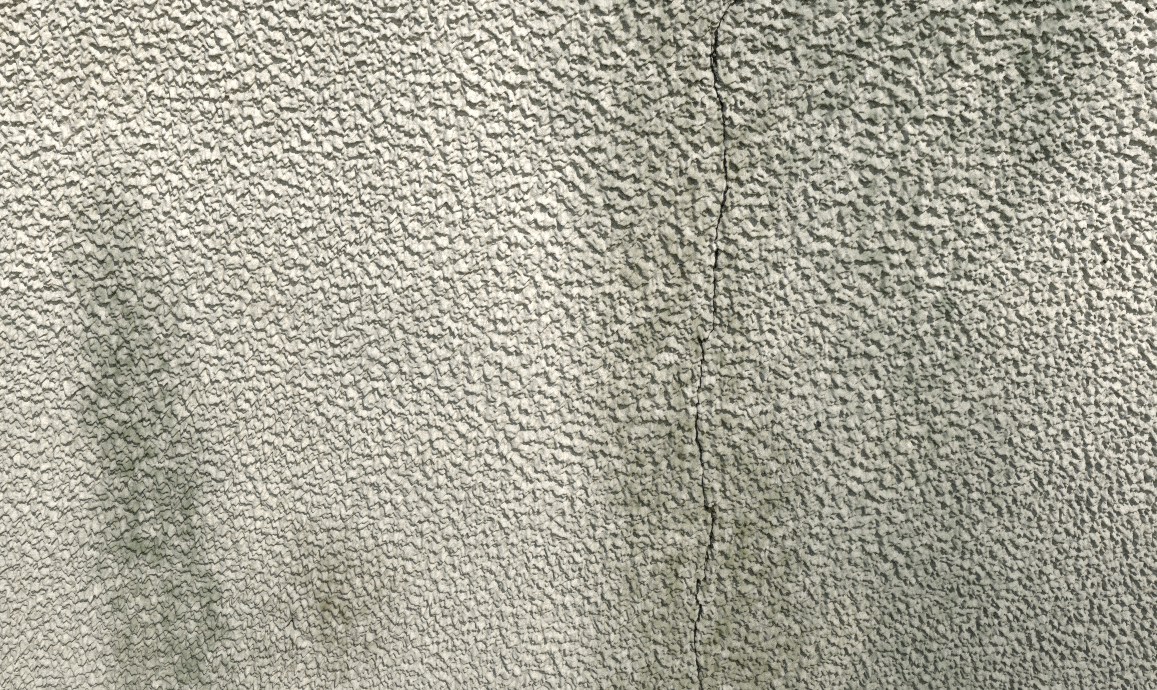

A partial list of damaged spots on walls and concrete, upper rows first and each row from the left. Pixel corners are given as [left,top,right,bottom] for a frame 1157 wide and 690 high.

crack [694,0,742,688]